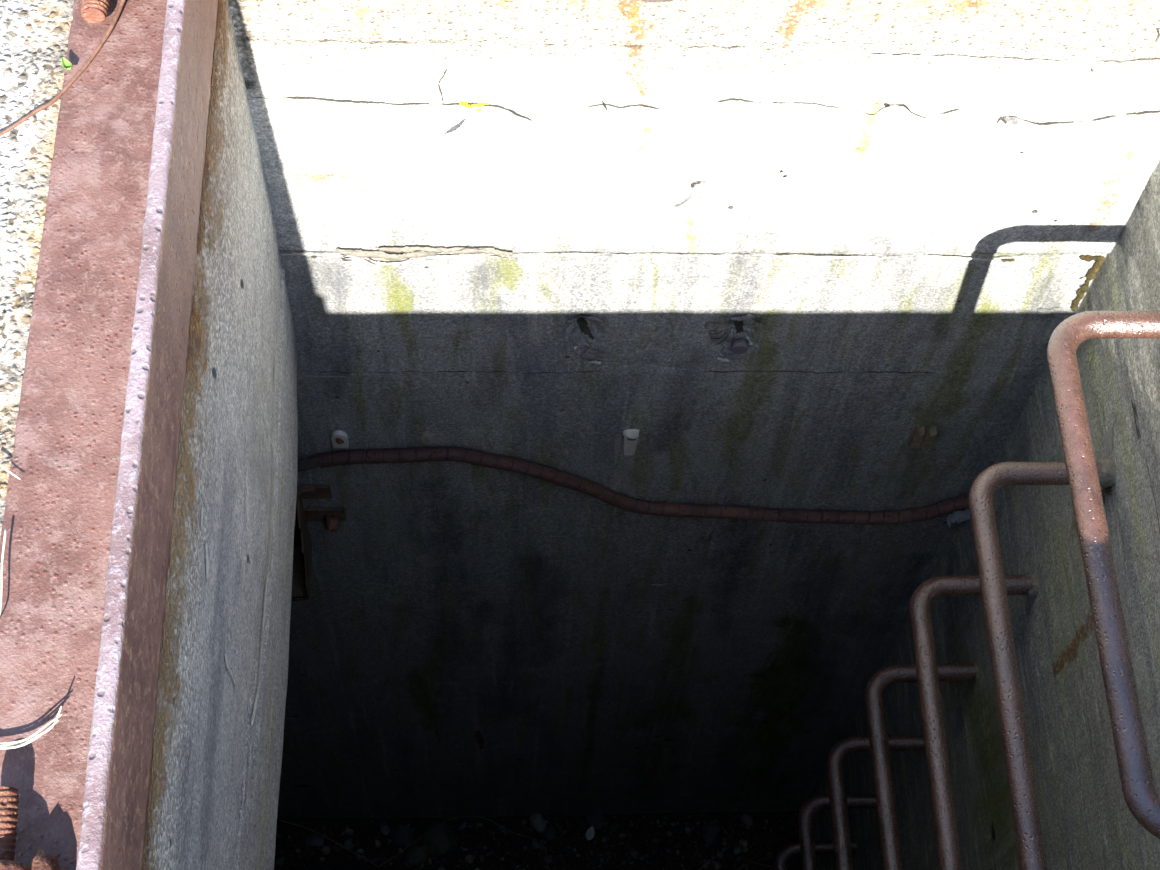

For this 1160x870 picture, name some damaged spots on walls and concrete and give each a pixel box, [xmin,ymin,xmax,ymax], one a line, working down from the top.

rust [619,0,673,94]
rust [781,0,825,47]
crack [253,40,753,122]
rust [197,0,229,253]
crack [997,111,1160,125]
spalling [674,181,706,208]
spalling [566,316,611,365]
spalling [705,314,762,363]
rust [143,268,209,870]